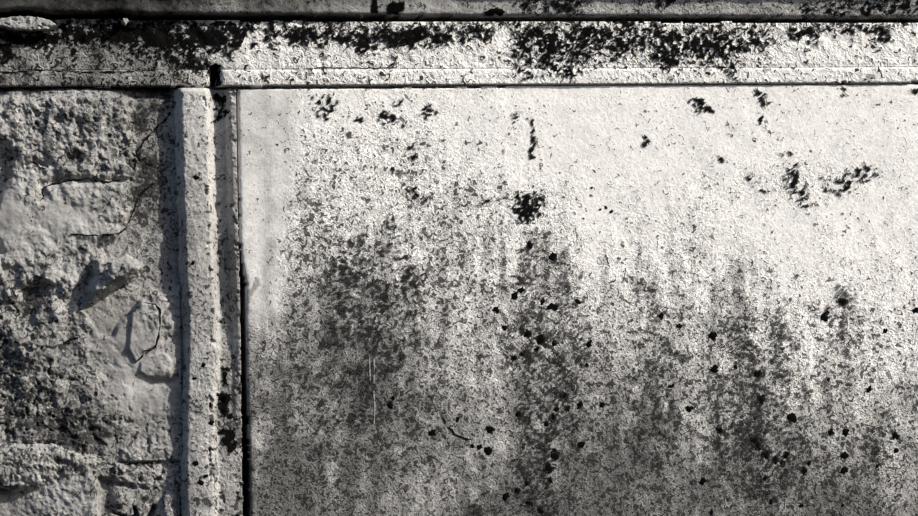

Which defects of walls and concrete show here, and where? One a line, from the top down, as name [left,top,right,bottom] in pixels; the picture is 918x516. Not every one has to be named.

leakage [0,18,894,123]
leakage [314,213,427,466]
leakage [500,231,593,516]
leakage [628,289,691,475]
leakage [708,297,812,514]
leakage [825,284,866,391]
leakage [865,401,900,487]